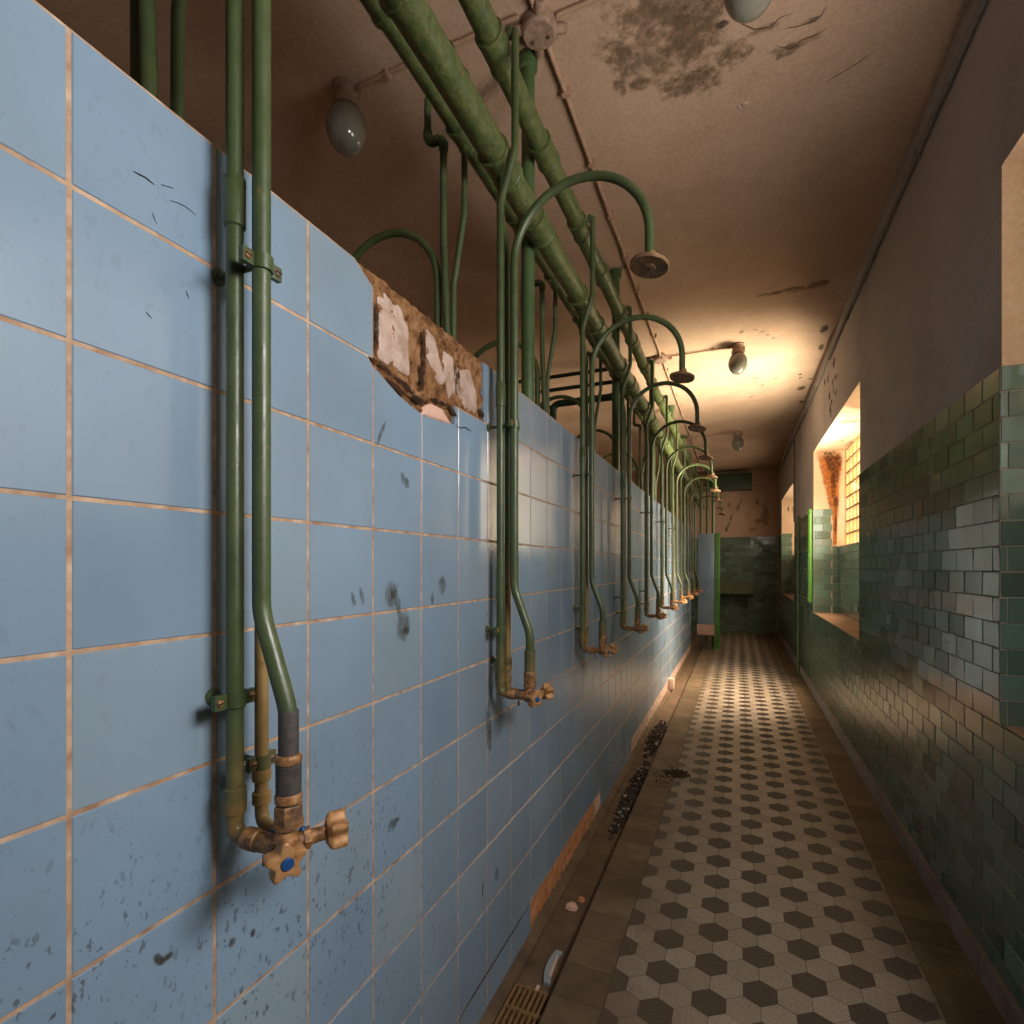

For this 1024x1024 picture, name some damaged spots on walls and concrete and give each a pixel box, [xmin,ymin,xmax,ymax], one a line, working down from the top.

damp [608,0,753,97]
crack [741,7,827,49]
crack [133,171,196,224]
spalling [358,263,484,424]
damp [389,588,409,635]